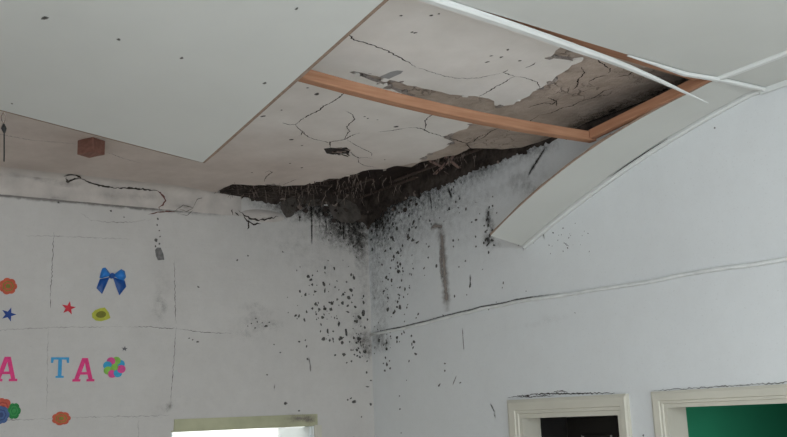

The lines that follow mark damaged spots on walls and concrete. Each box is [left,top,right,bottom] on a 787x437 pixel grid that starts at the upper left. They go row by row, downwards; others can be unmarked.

crack [284,94,372,167]
crack [382,115,510,150]
crack [349,35,633,121]
flaking render [350,47,689,131]
crack [66,174,201,216]
flaking render [220,124,557,230]
water stain [288,190,538,387]